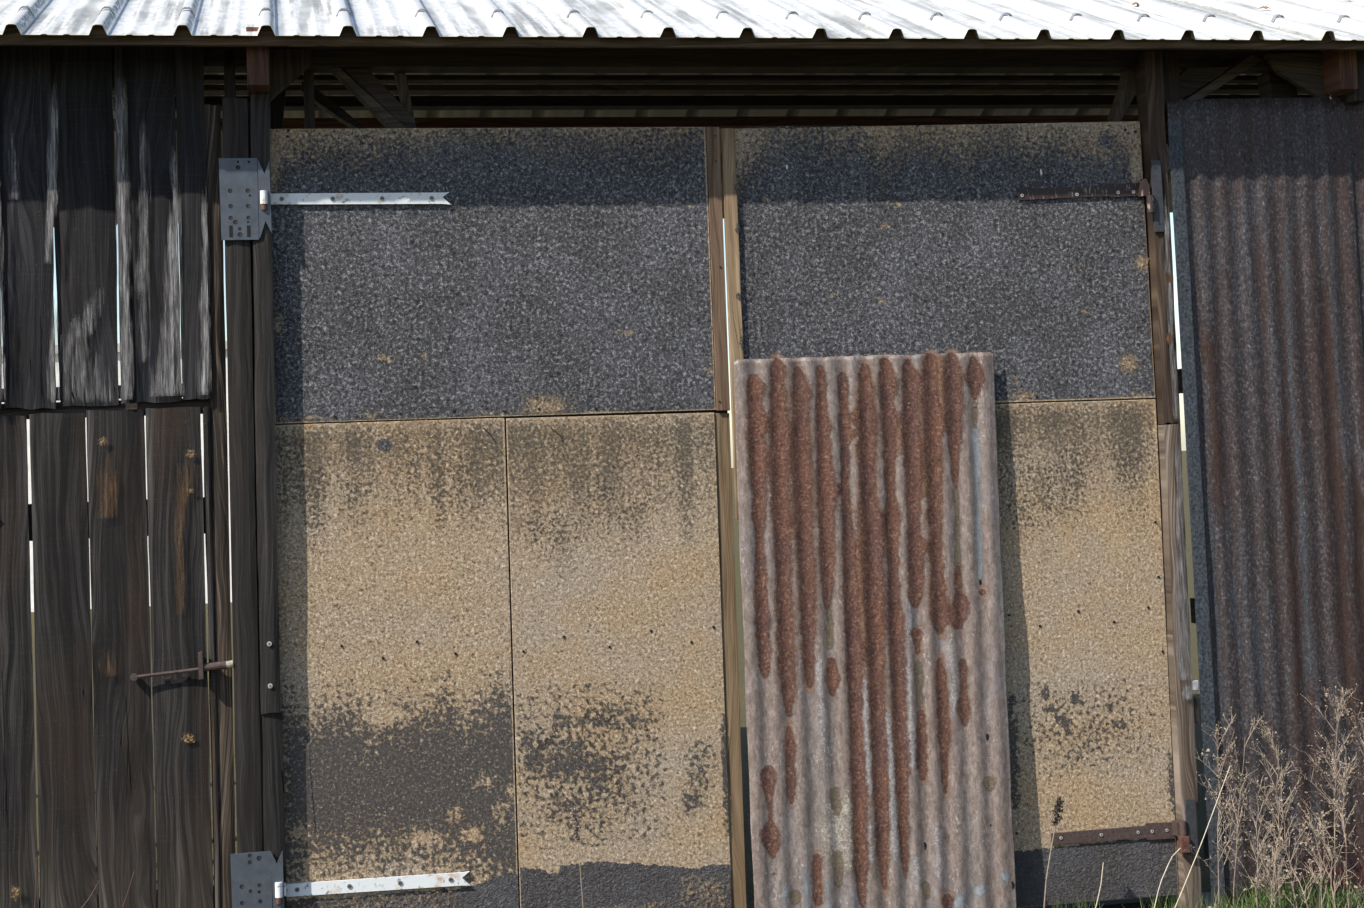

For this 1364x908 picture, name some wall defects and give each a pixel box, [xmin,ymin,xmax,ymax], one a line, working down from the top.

corrosion [745,350,987,908]
damp [281,667,669,883]
damp [681,713,730,834]
corrosion [983,776,996,791]
damp [1007,677,1164,809]